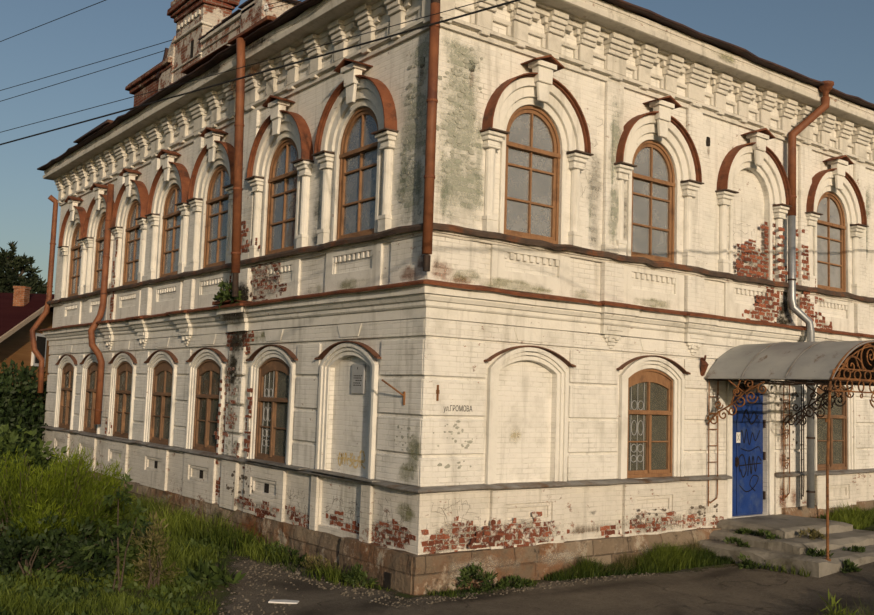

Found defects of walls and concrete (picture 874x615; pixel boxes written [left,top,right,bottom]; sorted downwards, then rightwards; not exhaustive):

flaking render [241,221,260,253]
flaking render [250,262,287,302]
flaking render [736,221,833,330]
flaking render [214,330,309,529]
flaking render [326,511,360,534]
flaking render [371,511,570,554]
flaking render [600,504,724,538]